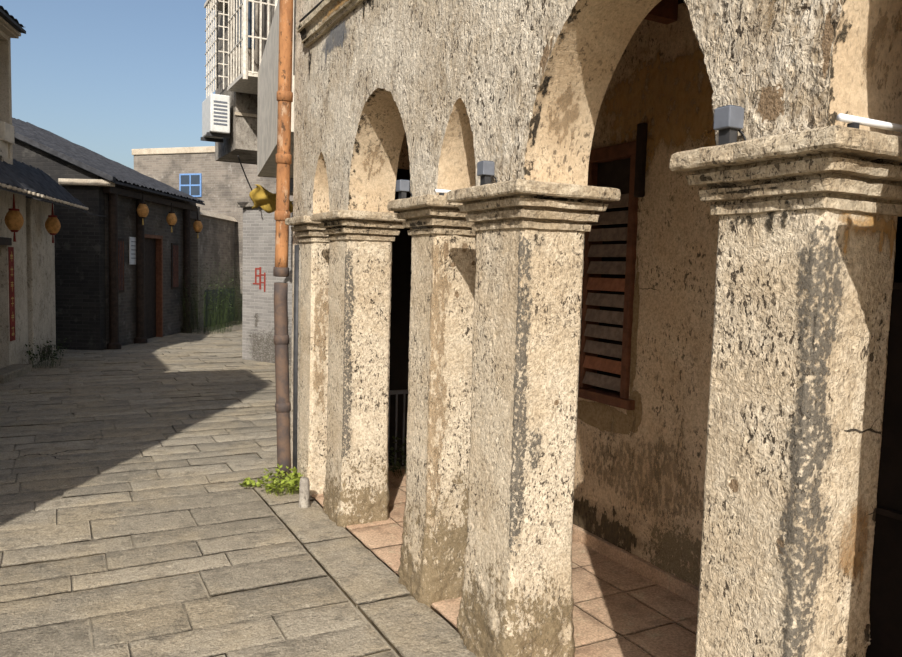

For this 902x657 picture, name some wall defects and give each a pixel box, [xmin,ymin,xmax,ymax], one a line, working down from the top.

damp [573,414,704,552]
crack [844,423,882,436]